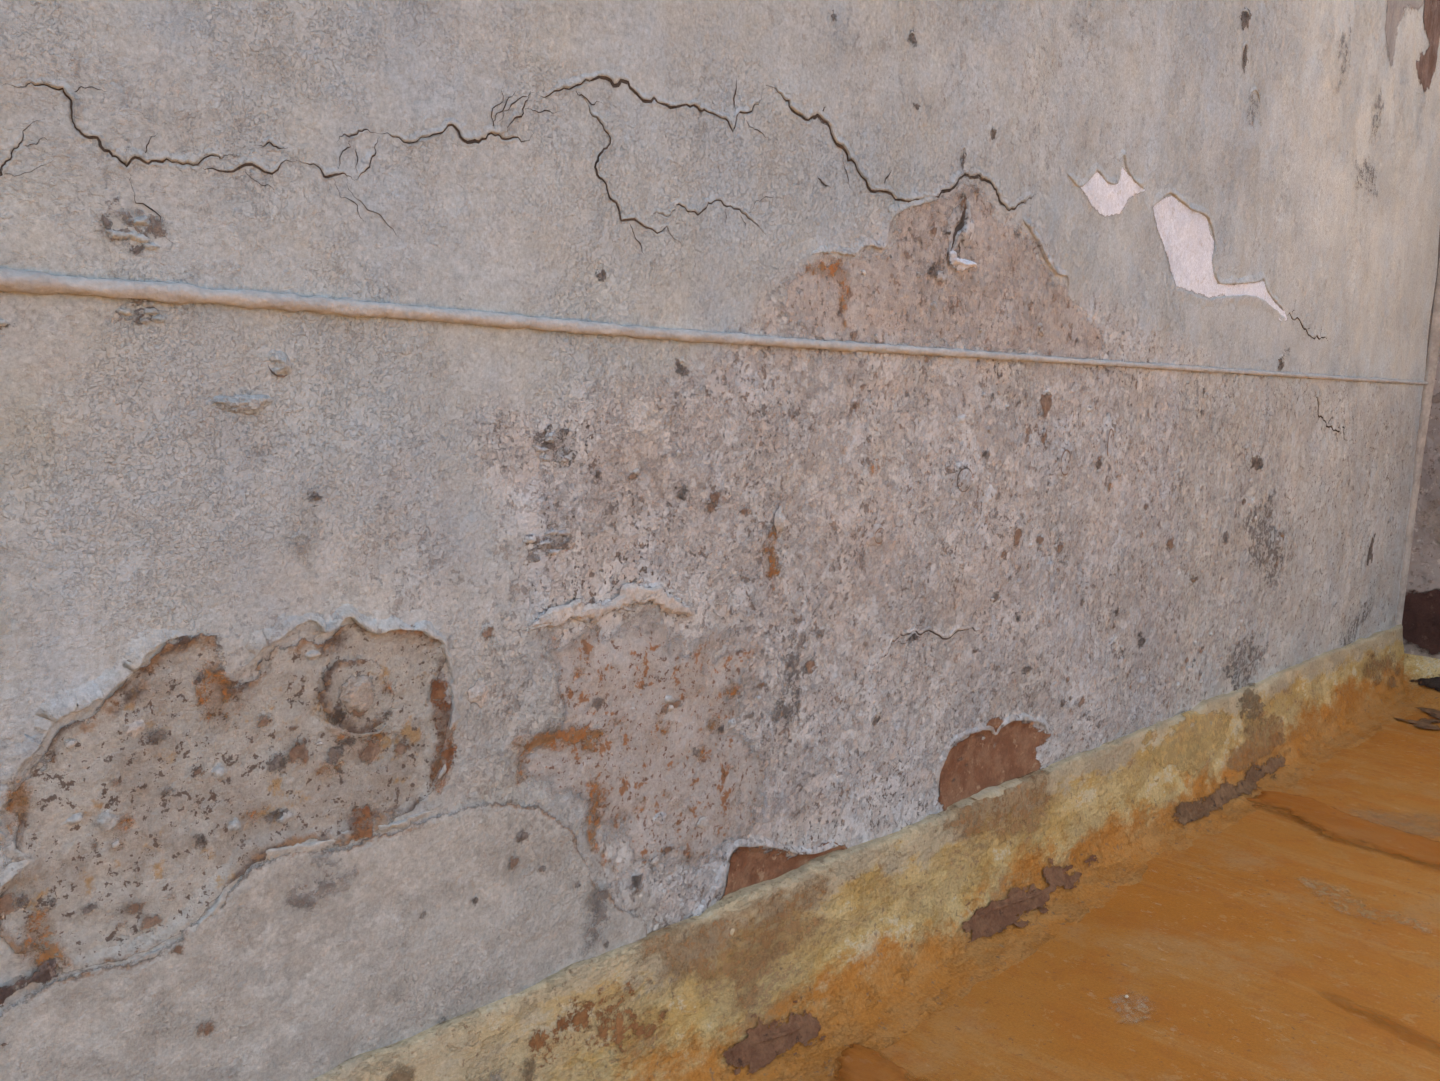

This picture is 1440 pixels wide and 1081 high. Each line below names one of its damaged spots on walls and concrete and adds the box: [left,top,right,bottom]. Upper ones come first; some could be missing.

peeling [1385,0,1440,91]
crack [0,69,1037,255]
peeling [1066,149,1287,327]
peeling [706,491,720,513]
peeling [1002,519,1063,574]
peeling [1223,431,1264,544]
spalling [0,604,463,1007]
spalling [510,578,847,916]
spalling [935,712,1051,811]
peeling [1044,677,1086,728]
peeling [575,882,611,948]
corrosion [526,981,666,1068]